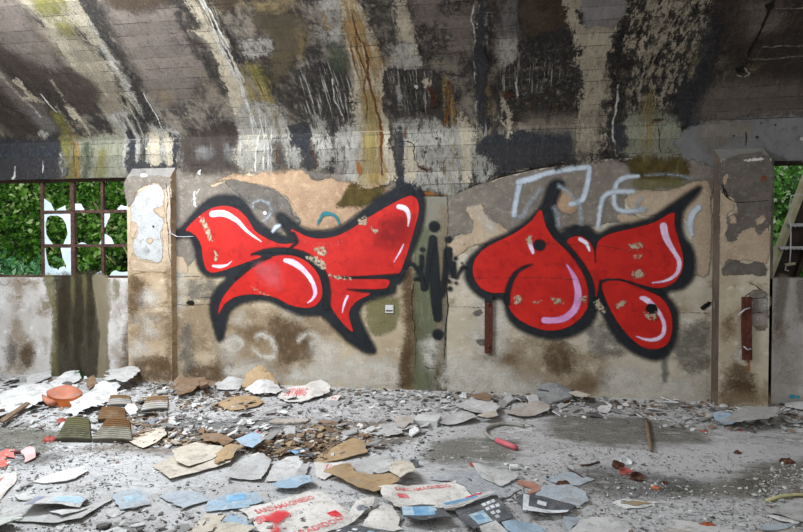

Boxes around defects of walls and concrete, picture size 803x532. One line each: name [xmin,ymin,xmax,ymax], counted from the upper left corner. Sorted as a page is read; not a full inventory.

corrosion [336,0,388,186]
damp [0,0,803,196]
crack [735,0,776,68]
peeling [123,162,378,280]
peeling [447,152,775,278]
damp [8,267,709,401]
damp [719,346,770,405]